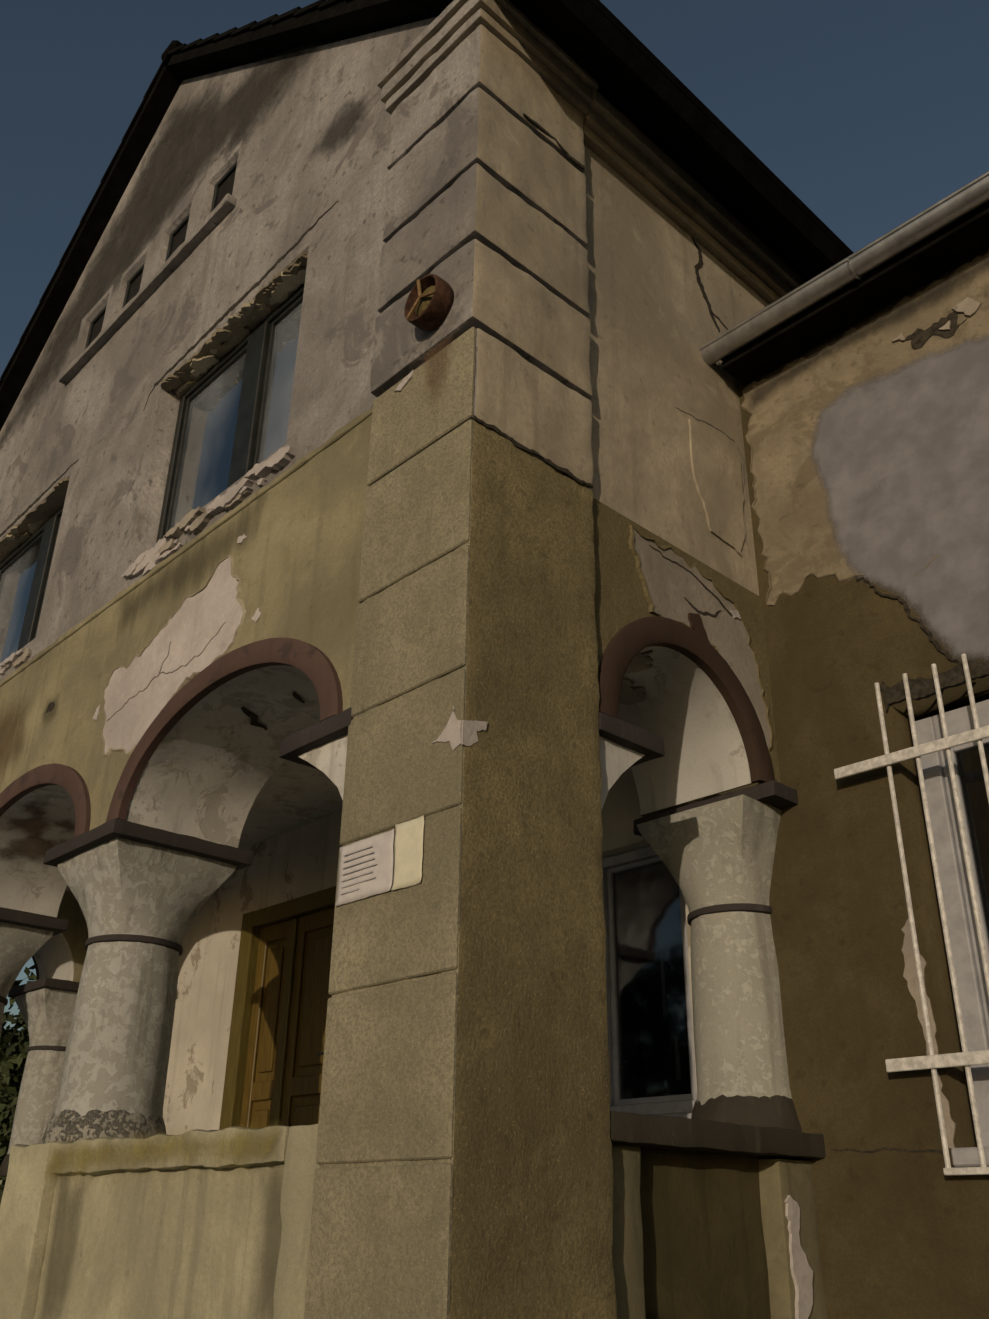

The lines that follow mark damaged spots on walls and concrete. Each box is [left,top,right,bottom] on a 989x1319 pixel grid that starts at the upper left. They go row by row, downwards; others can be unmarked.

damp [320,102,363,149]
crack [523,113,585,169]
crack [691,236,728,332]
peeling [741,251,989,606]
peeling [93,533,262,758]
peeling [628,525,773,758]
spalling [432,706,488,750]
peeling [901,918,956,1148]
peeling [784,1195,813,1319]